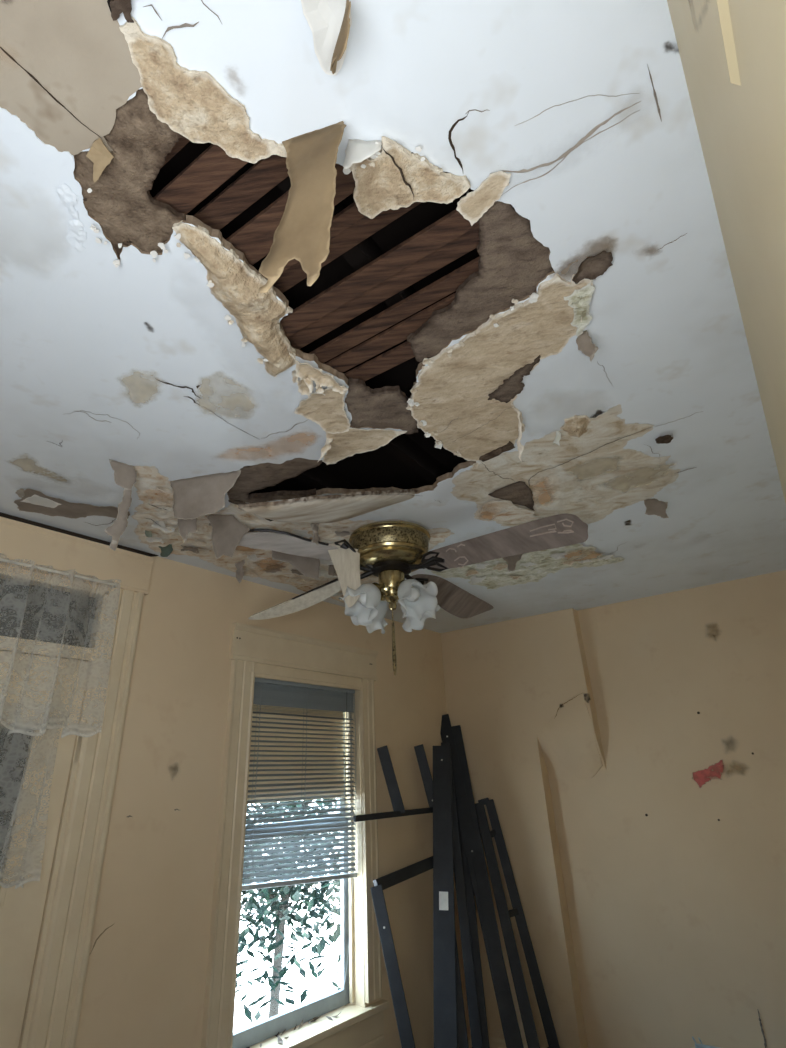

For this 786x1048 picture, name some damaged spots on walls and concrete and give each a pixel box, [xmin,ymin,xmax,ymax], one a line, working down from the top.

crack [0,47,101,138]
crack [448,109,490,171]
flaking render [0,0,703,603]